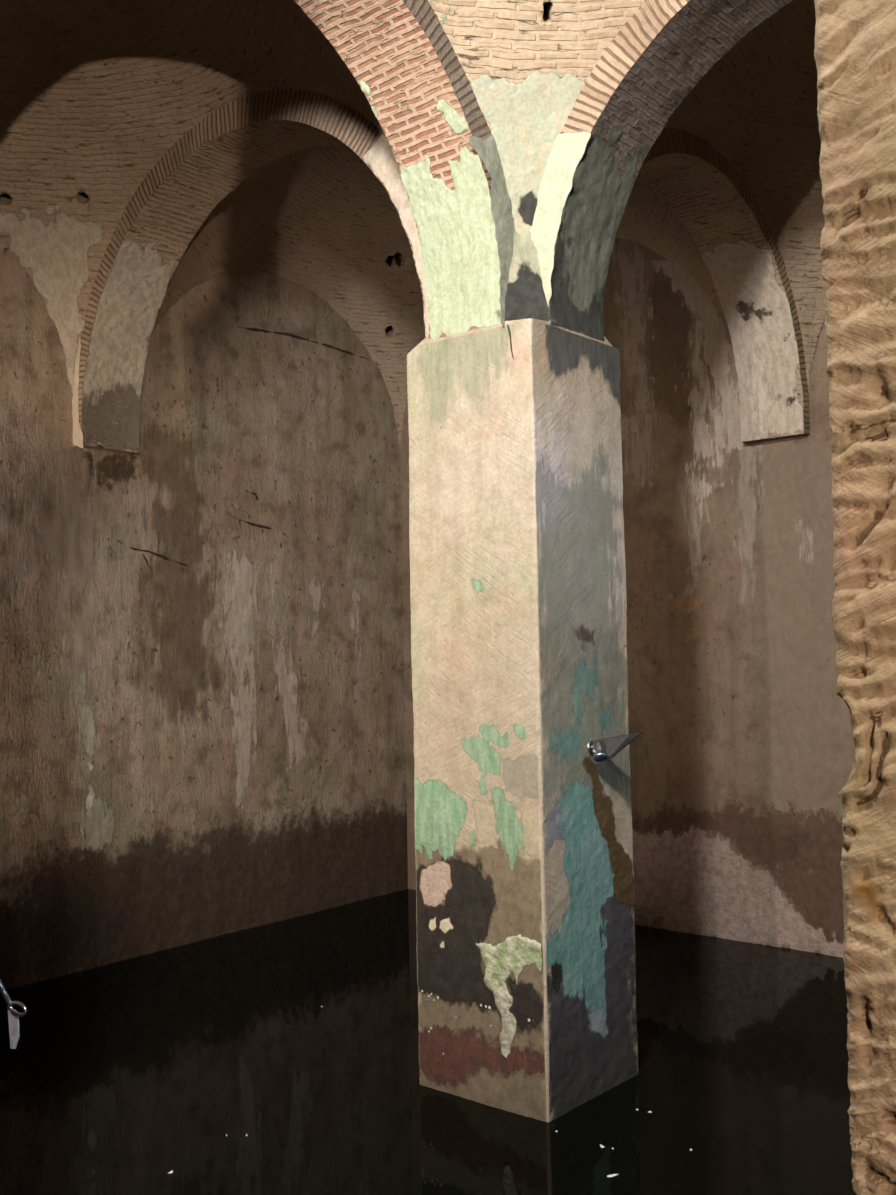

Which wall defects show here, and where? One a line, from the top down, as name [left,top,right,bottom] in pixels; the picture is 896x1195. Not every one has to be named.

flaking render [359,80,378,117]
flaking render [363,70,591,340]
flaking render [0,205,176,448]
crack [242,327,364,358]
damp [736,301,772,321]
crack [117,540,187,569]
damp [0,384,845,1122]
flaking render [420,861,452,907]